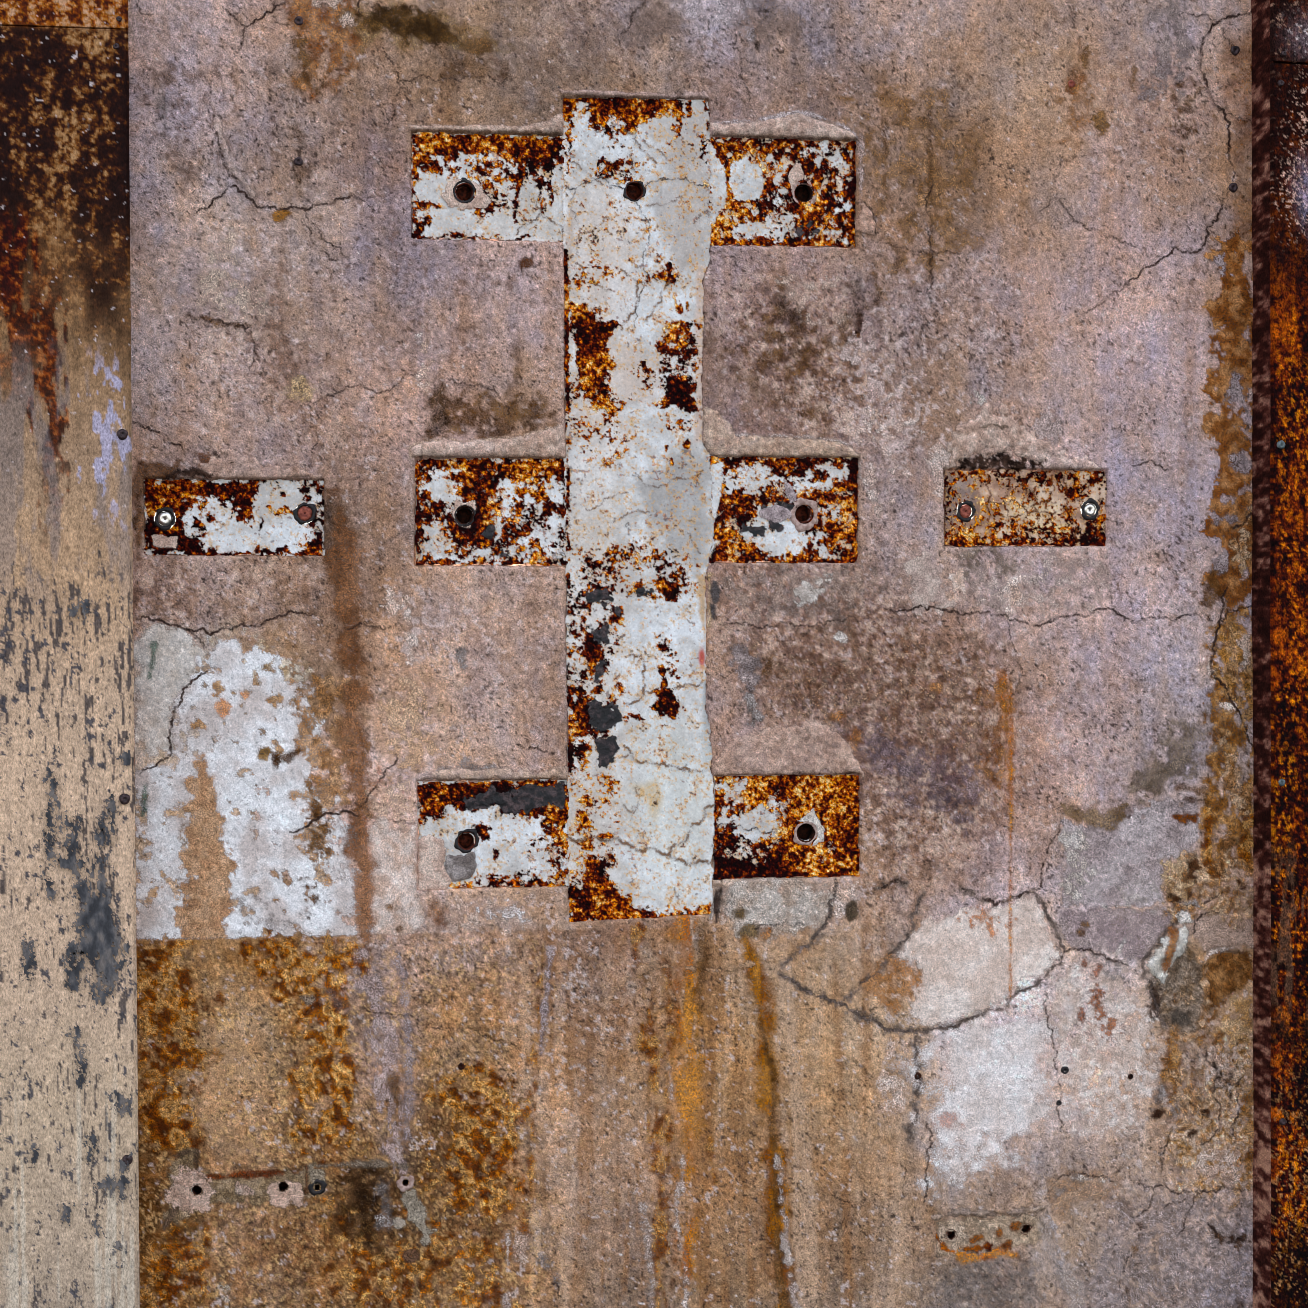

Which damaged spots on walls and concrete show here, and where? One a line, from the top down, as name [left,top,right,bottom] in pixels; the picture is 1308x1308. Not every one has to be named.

crack [1045,11,1252,311]
peeling [518,258,533,269]
peeling [416,326,435,392]
rust [144,478,325,556]
rust [944,468,1107,547]
rust [411,72,985,1308]
peeling [34,586,533,1013]
peeling [19,1137,48,1168]
rust [229,929,372,1165]
crack [755,826,1222,1202]
crack [1044,1132,1244,1243]
crack [1187,1051,1243,1145]